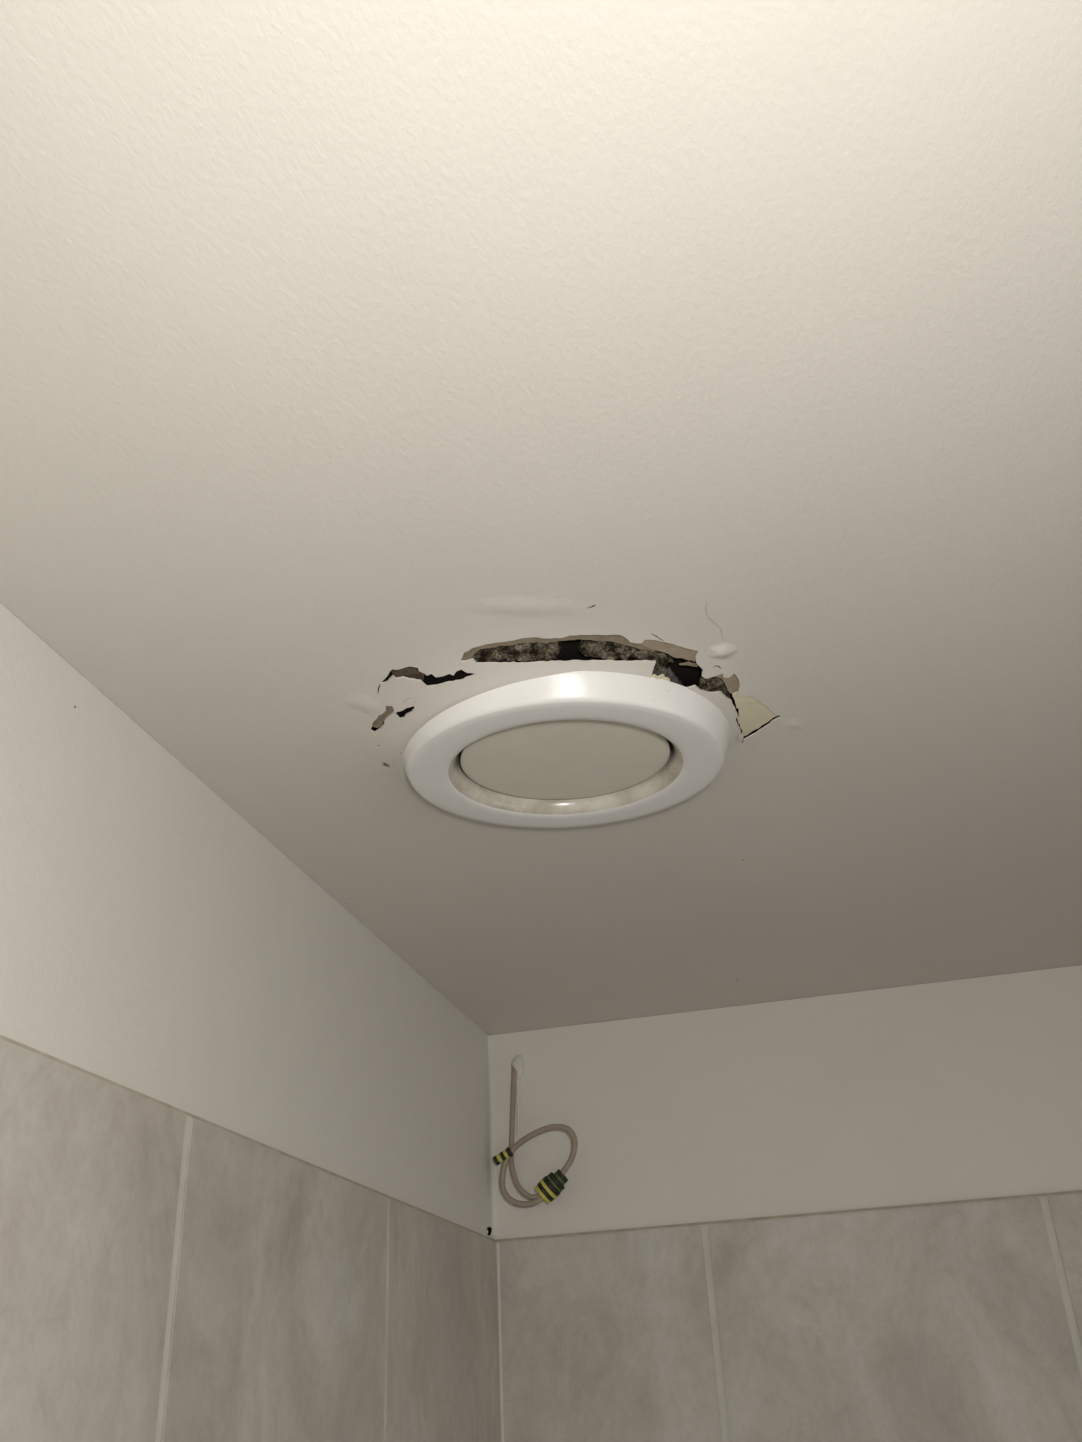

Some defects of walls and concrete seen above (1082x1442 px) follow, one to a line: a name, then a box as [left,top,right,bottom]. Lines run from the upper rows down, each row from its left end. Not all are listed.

spalling [372,706,393,728]
flaking render [461,634,780,750]